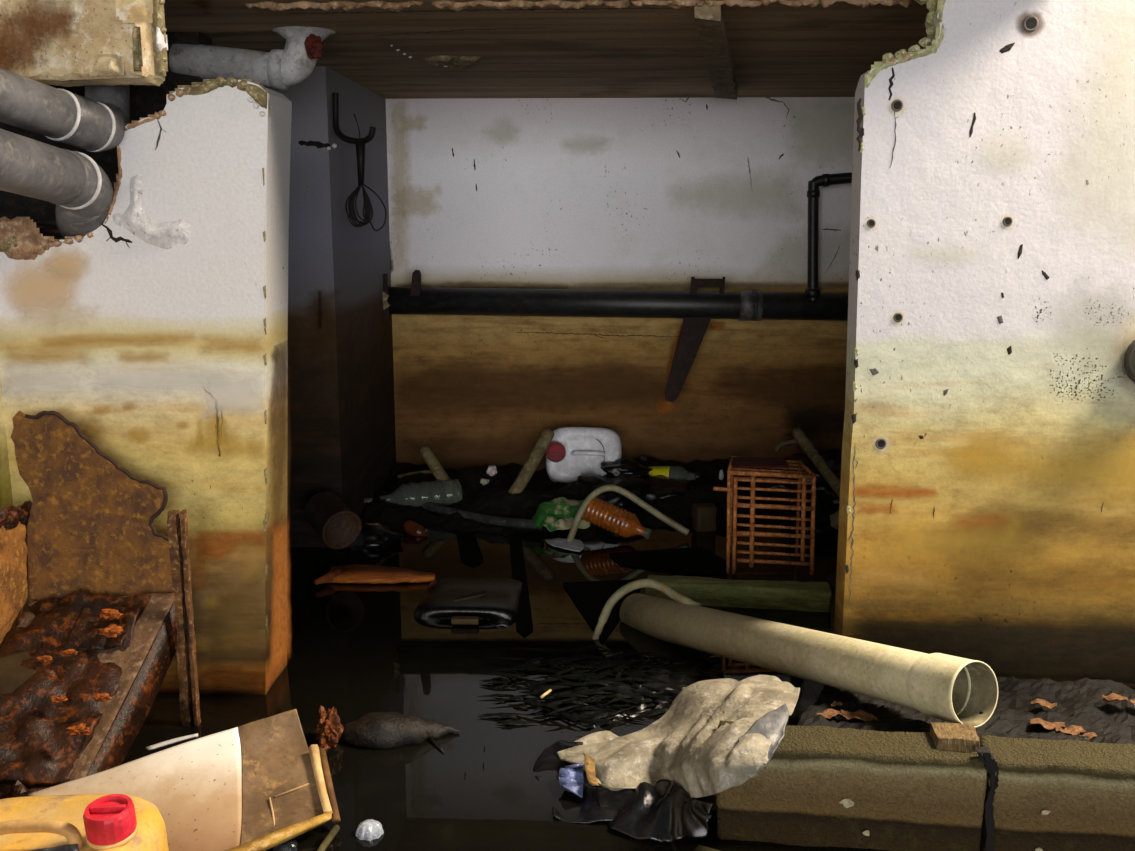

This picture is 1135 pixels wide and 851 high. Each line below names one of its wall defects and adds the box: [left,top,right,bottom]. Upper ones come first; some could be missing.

corrosion [0,2,72,70]
spalling [90,0,168,76]
crack [155,119,166,150]
spalling [124,76,270,131]
crack [888,68,898,168]
spalling [856,0,946,153]
spalling [0,216,94,260]
crack [102,224,132,248]
mould [1050,348,1118,404]
leakage [272,351,290,668]
leakage [856,487,934,513]
leakage [861,618,1135,672]